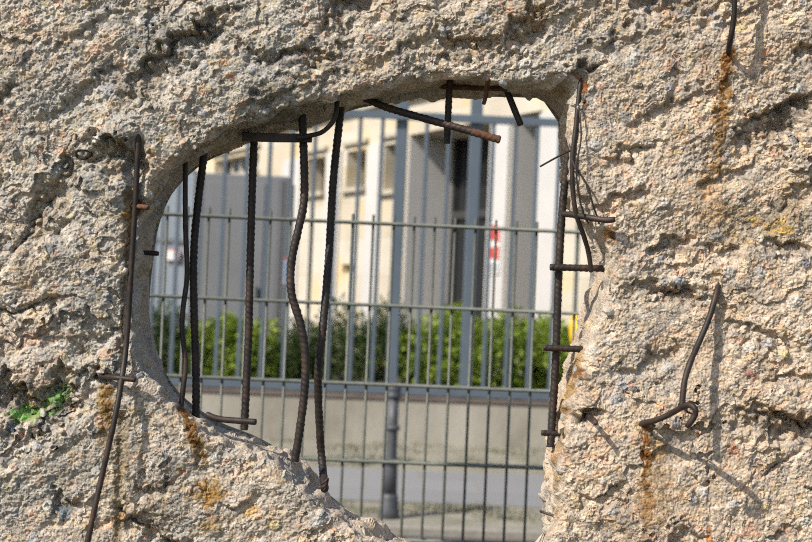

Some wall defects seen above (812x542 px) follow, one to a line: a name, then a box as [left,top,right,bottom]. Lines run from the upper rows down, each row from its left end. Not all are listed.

spalling [508,9,546,64]
spalling [363,27,523,144]
rust [712,47,737,151]
spalling [174,100,345,493]
spalling [541,60,616,448]
rust [96,385,113,432]
spalling [129,480,173,501]
rust [177,405,206,457]
rust [194,479,228,510]
rust [638,425,655,514]